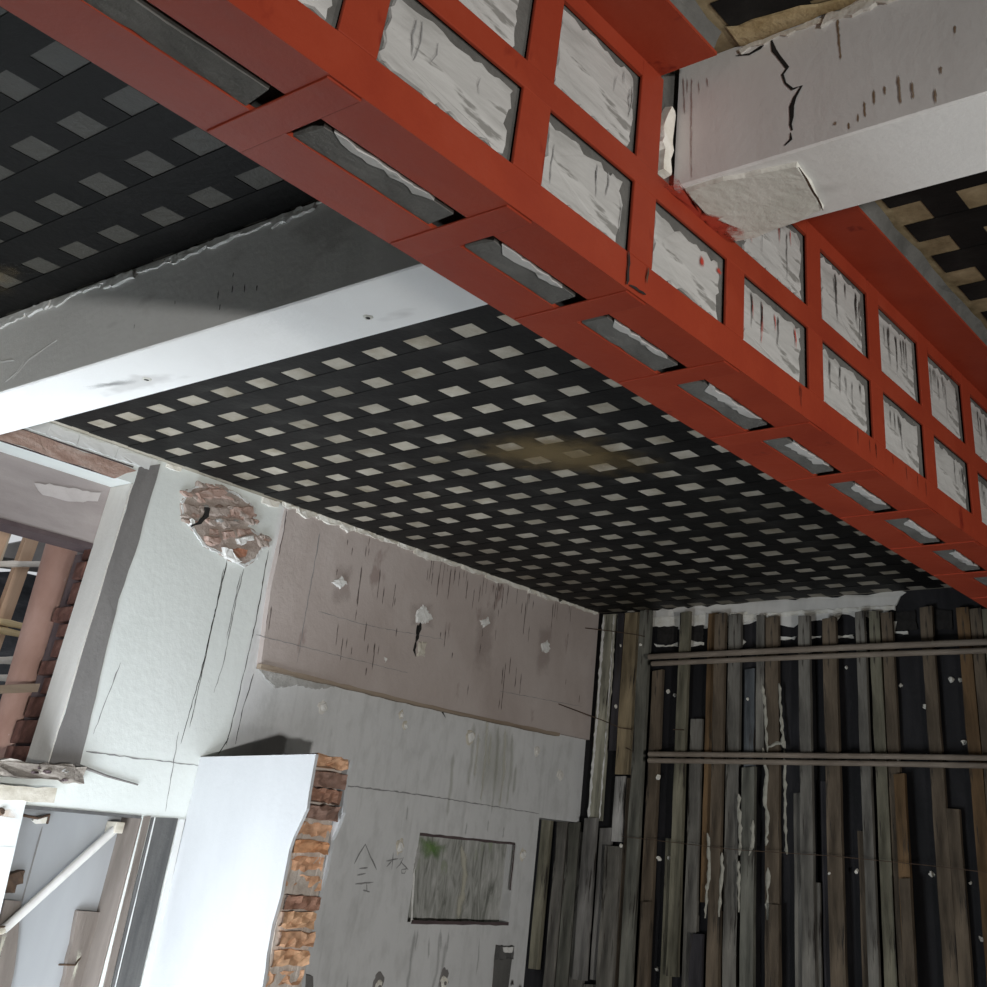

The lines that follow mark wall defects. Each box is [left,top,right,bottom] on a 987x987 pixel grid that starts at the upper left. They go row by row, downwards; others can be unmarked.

peeling [725,0,895,54]
crack [736,40,803,145]
crack [798,167,823,210]
spalling [180,481,598,615]
crack [86,510,441,807]
damp [736,683,788,912]
damp [704,833,724,918]